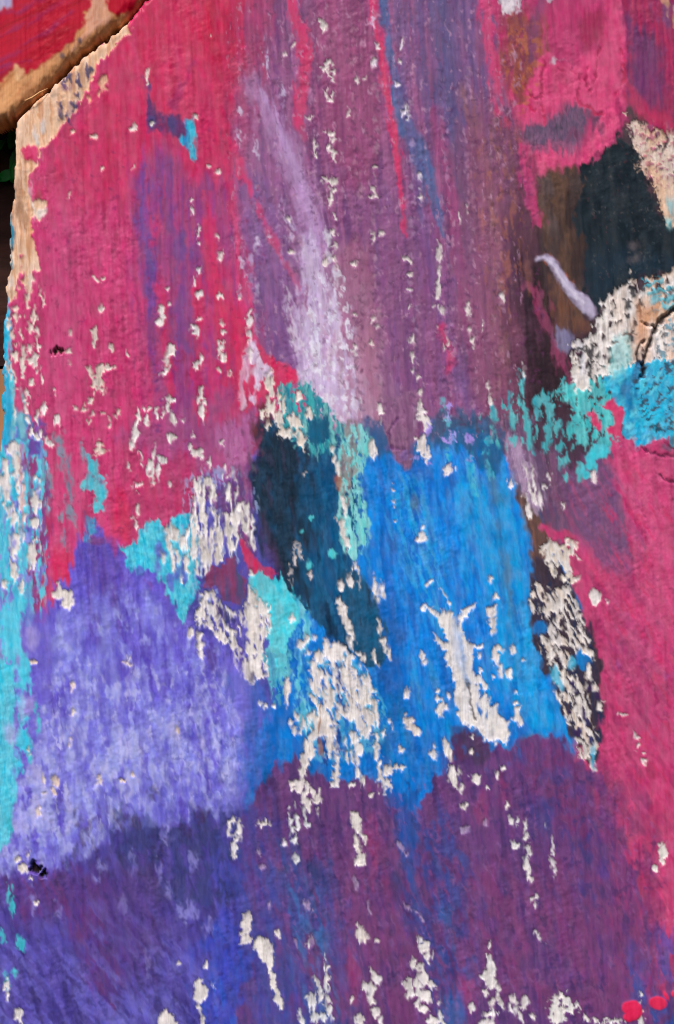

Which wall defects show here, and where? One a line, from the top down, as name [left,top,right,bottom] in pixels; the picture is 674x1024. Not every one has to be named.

peeling [623,112,674,227]
peeling [5,22,132,448]
peeling [570,267,674,394]
crack [612,307,674,380]
peeling [161,434,257,585]
peeling [188,569,272,686]
peeling [258,495,421,865]
peeling [421,576,524,755]
peeling [529,539,603,772]
peeling [239,912,285,1011]
peeling [401,935,446,1024]
peeling [468,941,623,1024]